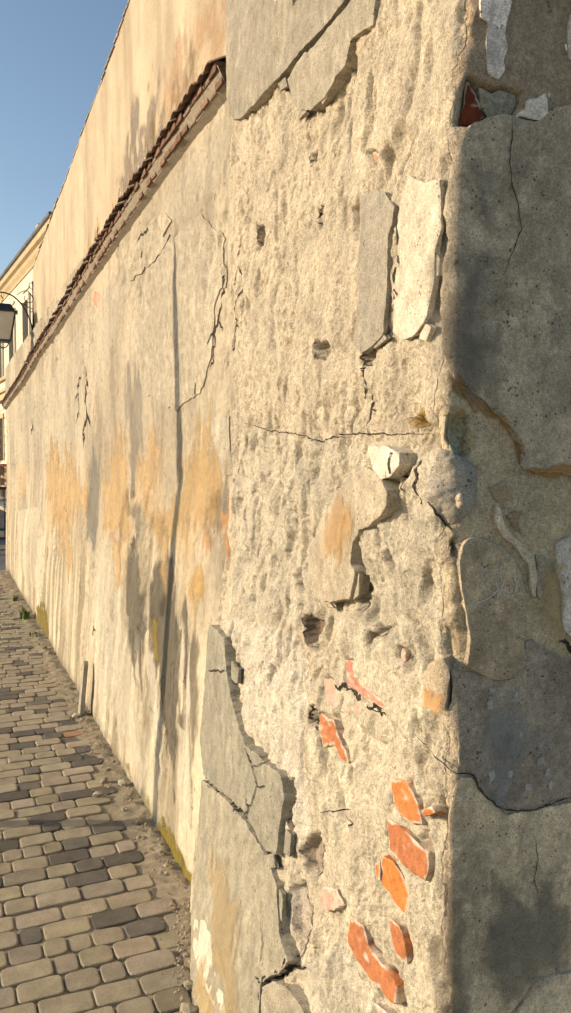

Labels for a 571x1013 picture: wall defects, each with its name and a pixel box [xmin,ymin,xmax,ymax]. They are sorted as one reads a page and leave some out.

crack [501,116,525,277]
crack [207,243,243,370]
flaking render [8,0,571,709]
leakage [86,448,99,546]
crack [244,348,453,532]
leakage [125,367,198,818]
crack [206,749,271,854]
flaking render [190,537,571,1013]
crack [255,919,306,1005]